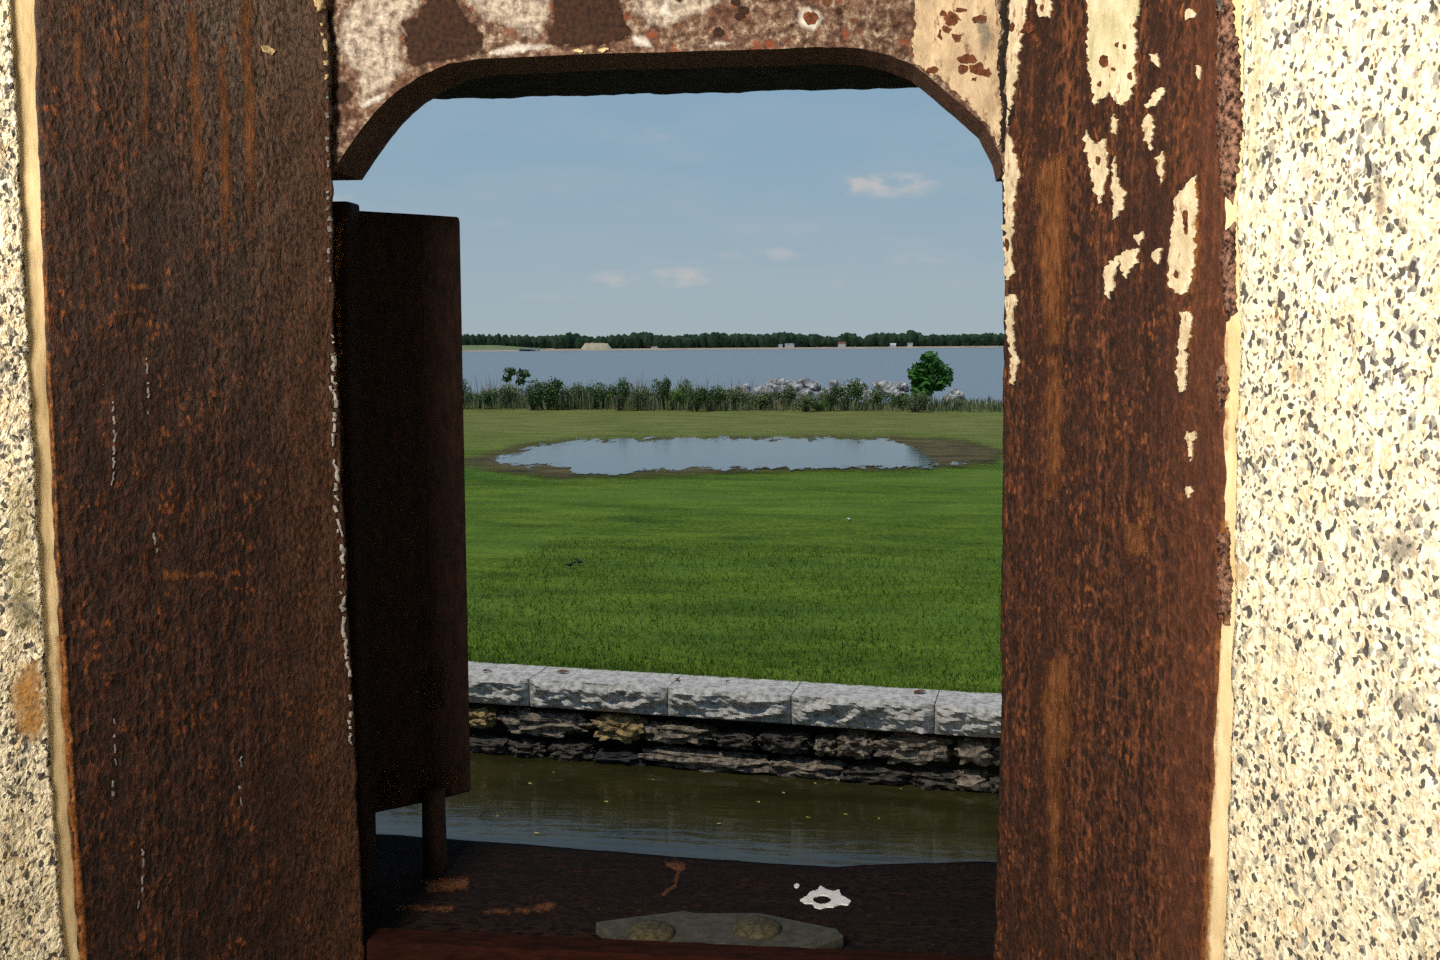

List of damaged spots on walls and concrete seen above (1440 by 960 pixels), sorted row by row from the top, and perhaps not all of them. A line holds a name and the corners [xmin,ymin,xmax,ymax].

peeling [340,0,418,97]
rust [401,0,483,66]
peeling [469,0,549,36]
rust [547,0,631,47]
peeling [633,0,718,26]
rust [789,0,858,29]
peeling [911,0,1053,385]
rust [1035,153,1068,498]
peeling [1082,0,1166,220]
peeling [1102,175,1199,392]
rust [57,636,87,960]
rust [1043,655,1071,907]